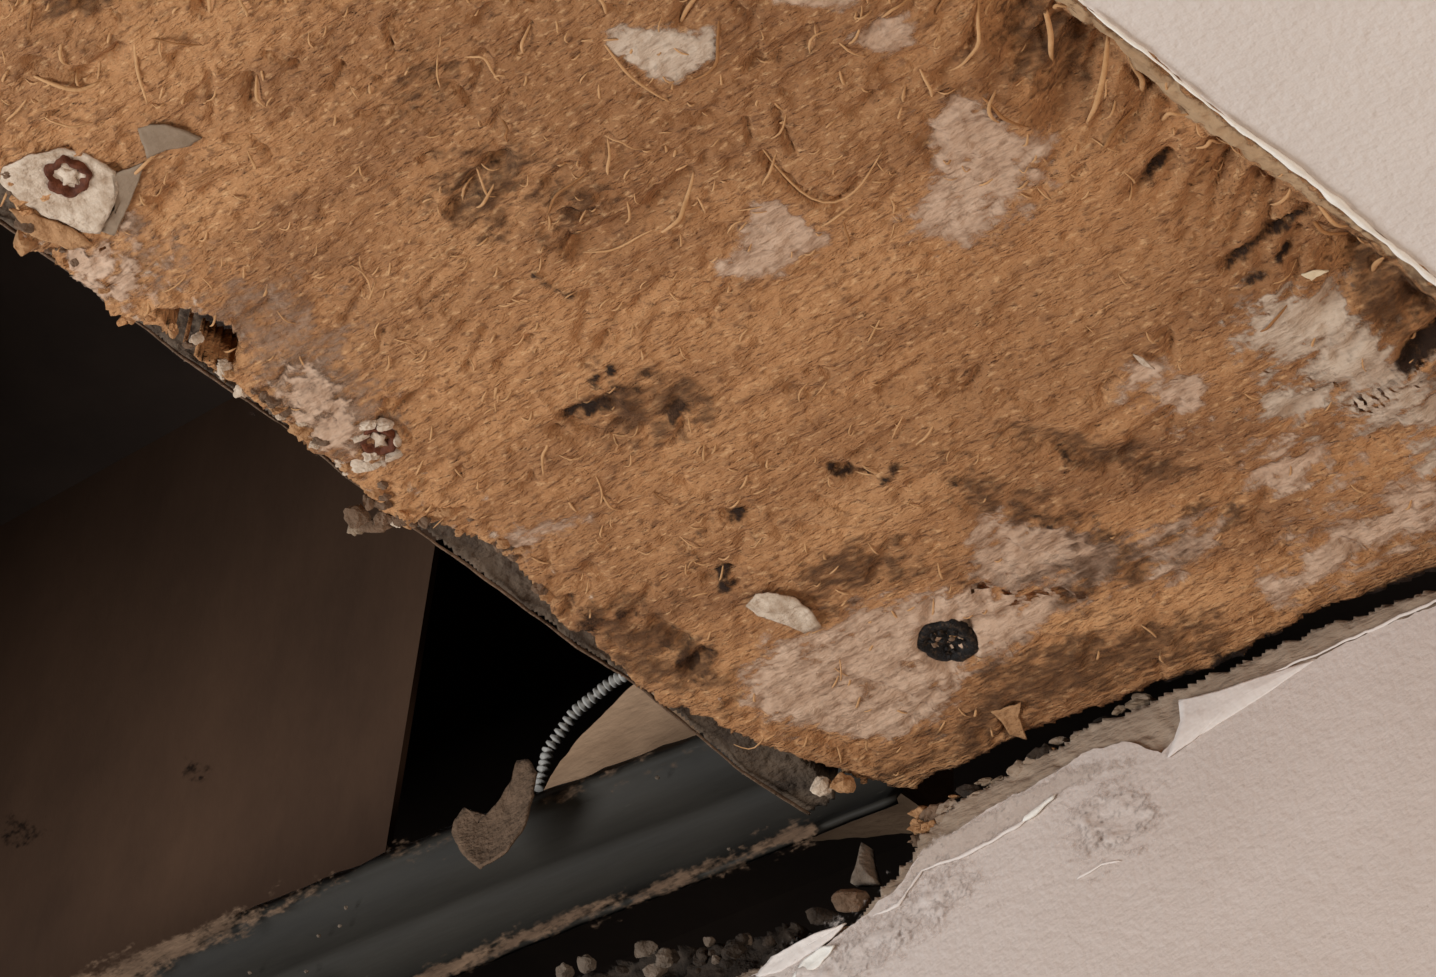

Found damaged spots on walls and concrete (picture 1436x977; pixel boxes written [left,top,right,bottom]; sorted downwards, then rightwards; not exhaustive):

peeling [606,23,716,81]
damp [1001,0,1087,96]
peeling [910,95,1057,248]
peeling [9,208,186,313]
peeling [715,200,830,277]
damp [1347,231,1436,335]
peeling [276,357,403,473]
peeling [1220,273,1436,609]
damp [806,535,920,610]
peeling [738,506,1226,741]
damp [956,608,1251,755]
flaking render [658,591,1436,977]